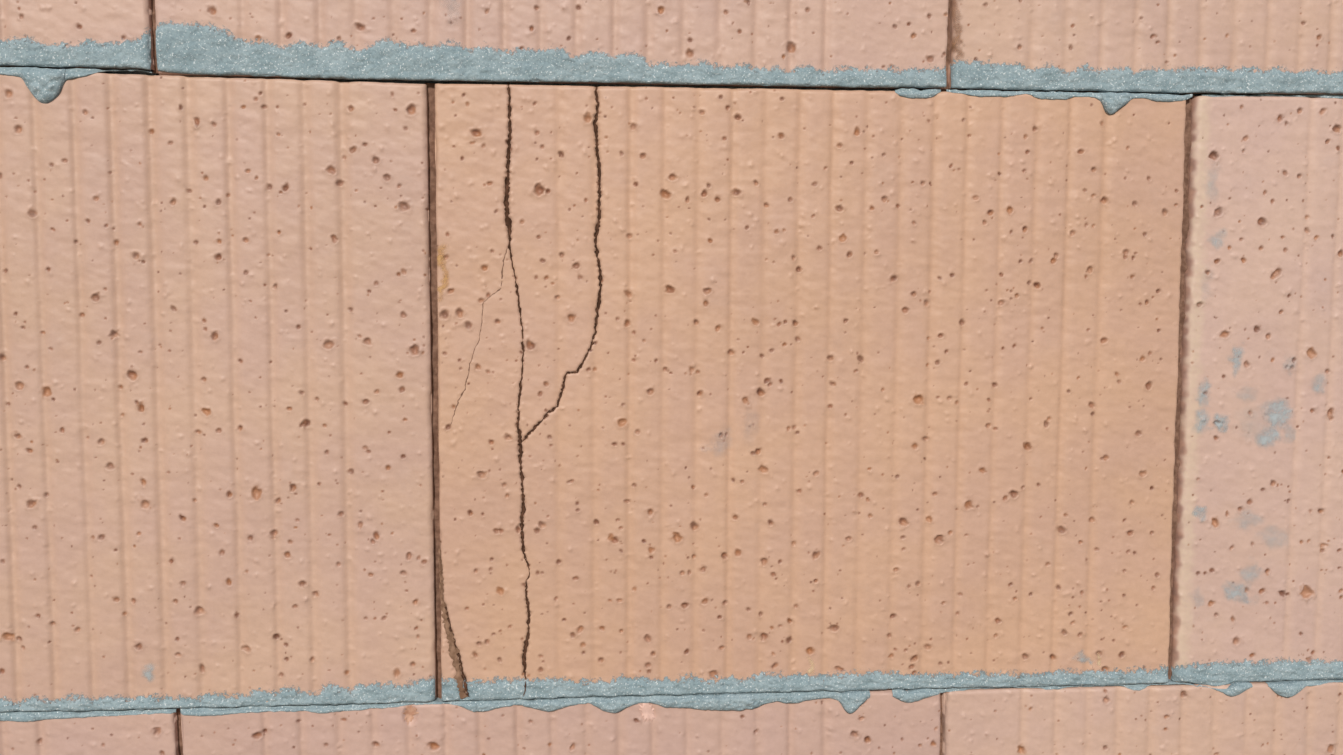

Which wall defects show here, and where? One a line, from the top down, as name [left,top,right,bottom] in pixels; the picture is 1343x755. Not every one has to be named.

crack [438,547,469,699]
crack [451,83,602,697]